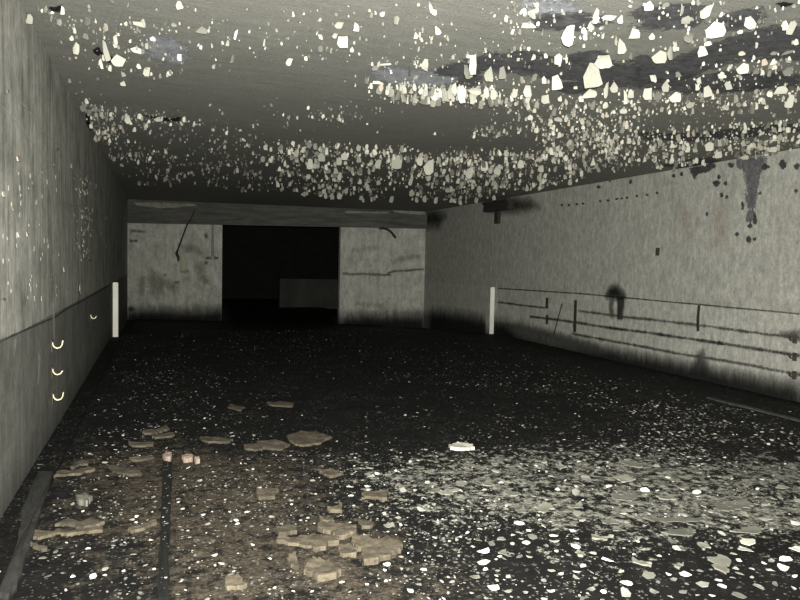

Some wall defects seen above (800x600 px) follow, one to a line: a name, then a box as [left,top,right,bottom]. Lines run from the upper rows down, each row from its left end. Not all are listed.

peeling [26,2,240,86]
peeling [68,0,800,243]
peeling [71,164,108,261]
crack [346,268,423,276]